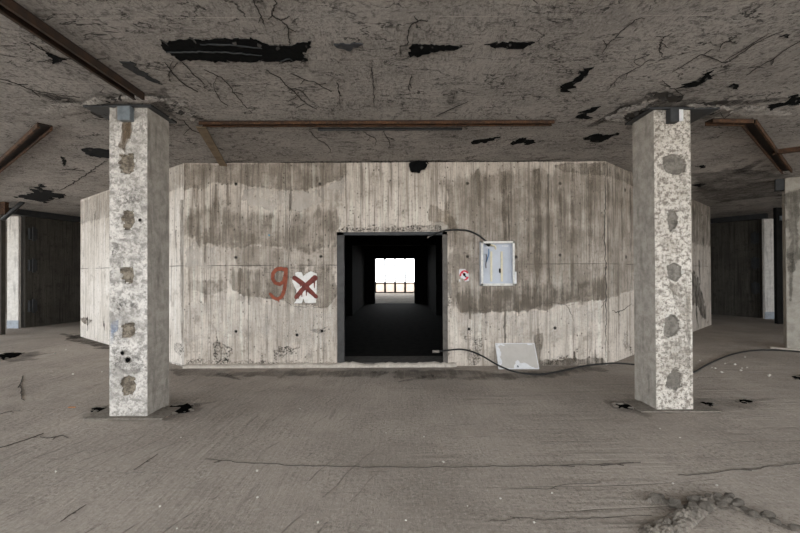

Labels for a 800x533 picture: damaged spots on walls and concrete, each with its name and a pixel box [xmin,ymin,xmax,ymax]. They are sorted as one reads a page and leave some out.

crack [253,0,296,45]
peeling [160,37,311,64]
peeling [408,44,463,58]
peeling [484,41,535,50]
crack [608,31,800,97]
crack [165,62,247,108]
spalling [81,148,136,174]
peeling [13,184,66,203]
damp [175,161,359,252]
damp [435,158,629,341]
damp [232,268,337,308]
crack [209,459,641,490]